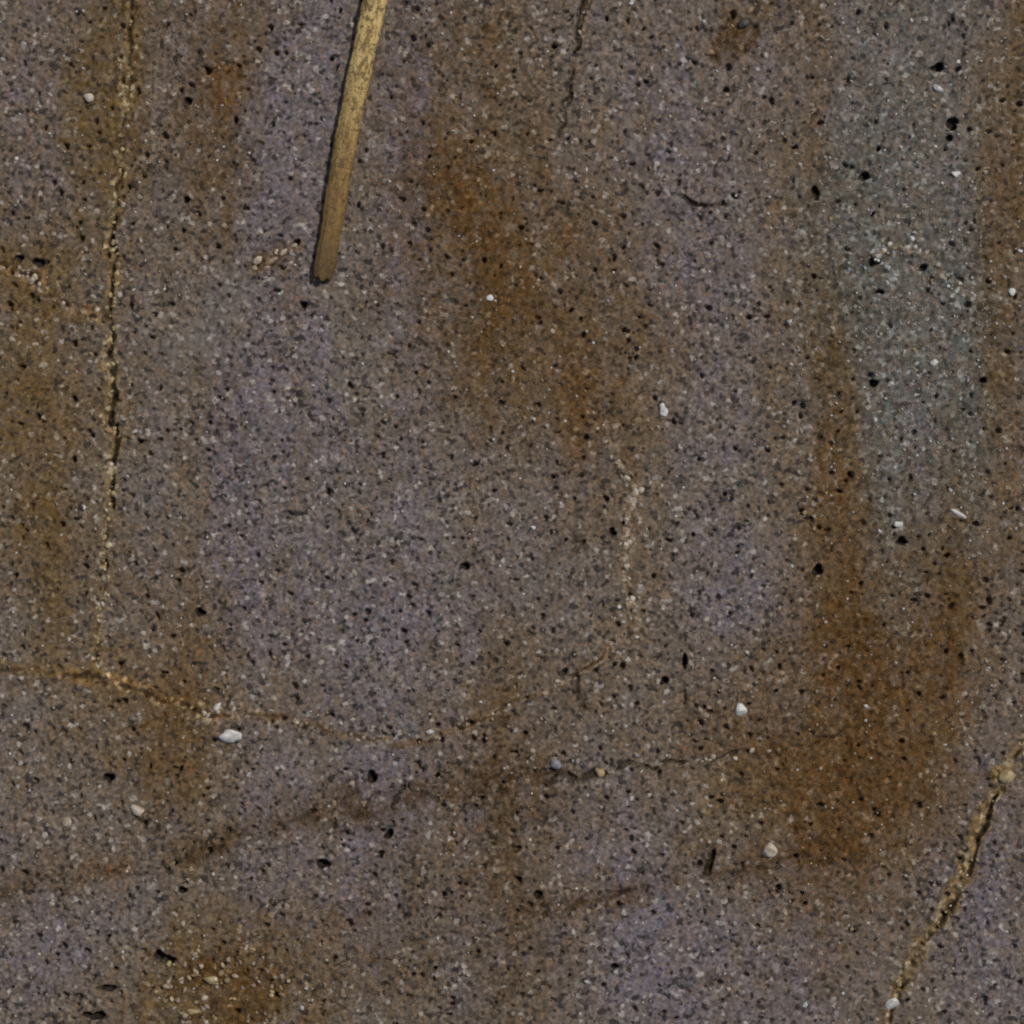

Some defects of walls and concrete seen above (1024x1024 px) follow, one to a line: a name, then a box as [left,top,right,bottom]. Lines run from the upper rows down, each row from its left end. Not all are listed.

crack [0,0,645,748]
crack [878,733,1024,1024]